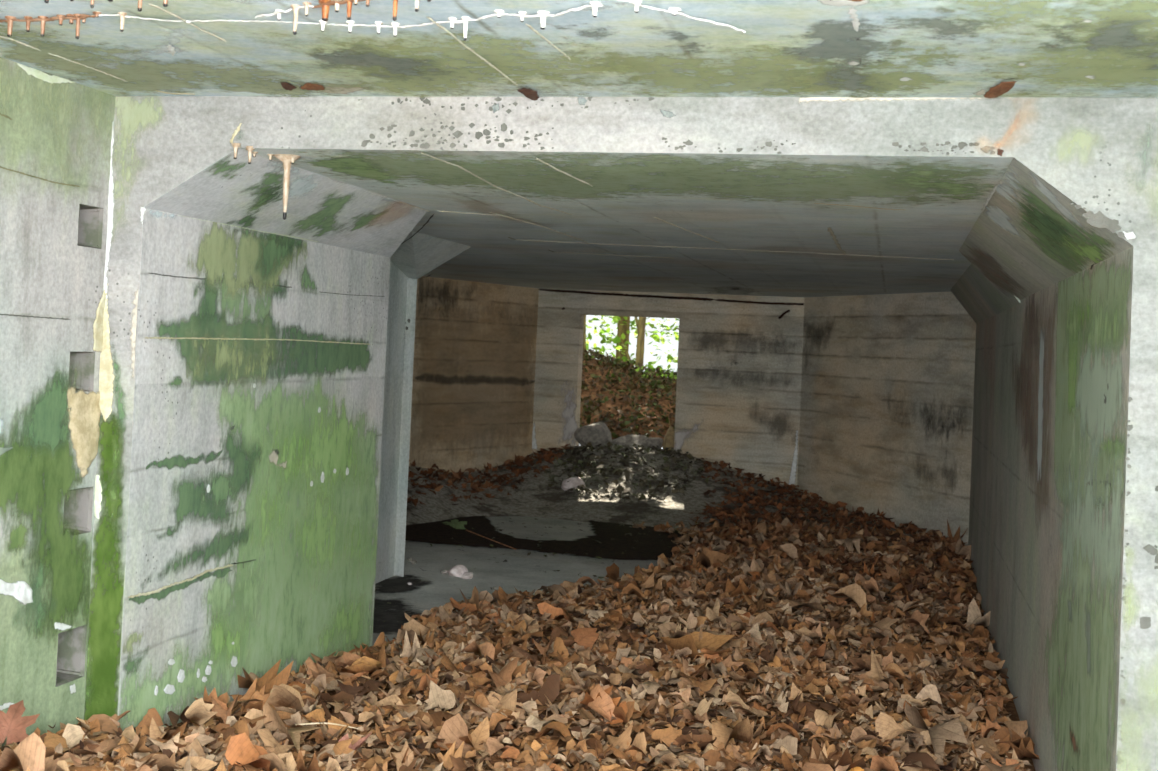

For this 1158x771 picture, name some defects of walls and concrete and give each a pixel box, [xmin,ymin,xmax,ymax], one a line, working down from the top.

water stain [17,63,76,84]
water stain [981,170,1105,264]
water stain [195,157,394,323]
water stain [146,449,223,469]
water stain [1012,294,1123,621]
water stain [8,522,29,552]
water stain [0,565,71,631]
water stain [129,568,232,604]
water stain [123,633,142,652]
water stain [70,645,92,699]
water stain [154,658,213,696]